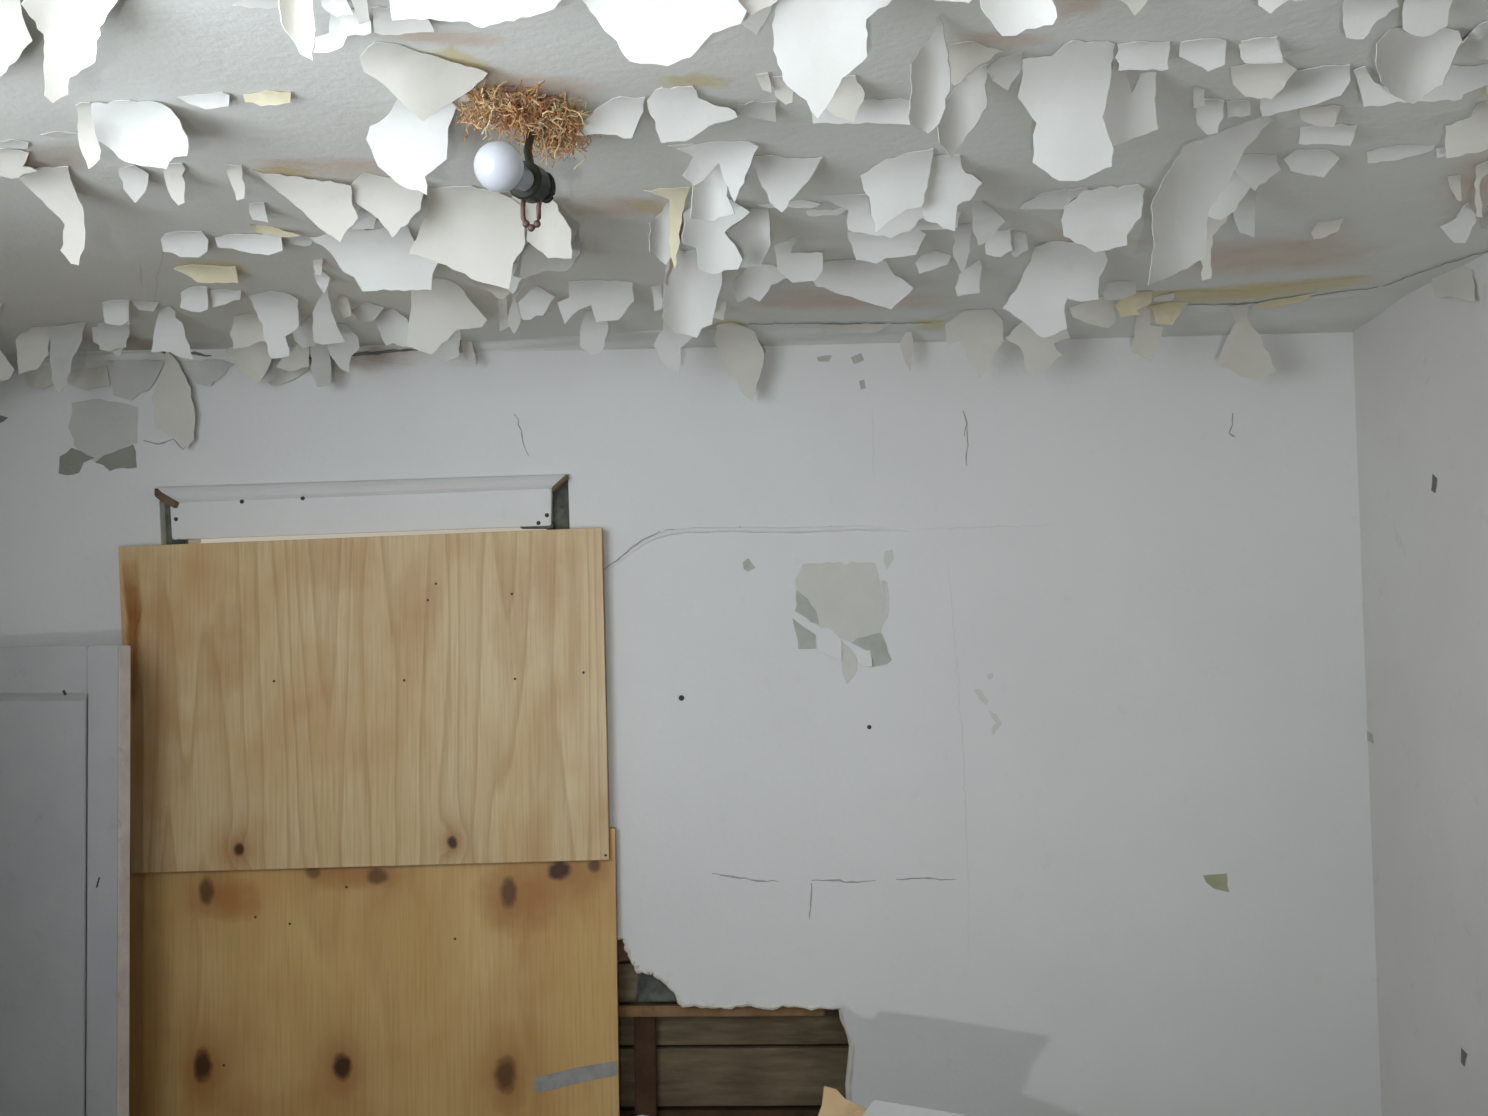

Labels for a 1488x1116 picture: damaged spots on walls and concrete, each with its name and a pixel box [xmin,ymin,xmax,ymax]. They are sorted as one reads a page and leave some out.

peeling [0,0,634,475]
peeling [576,0,1488,401]
peeling [793,562,892,684]
crack [712,873,955,920]
flaking render [617,934,855,1116]